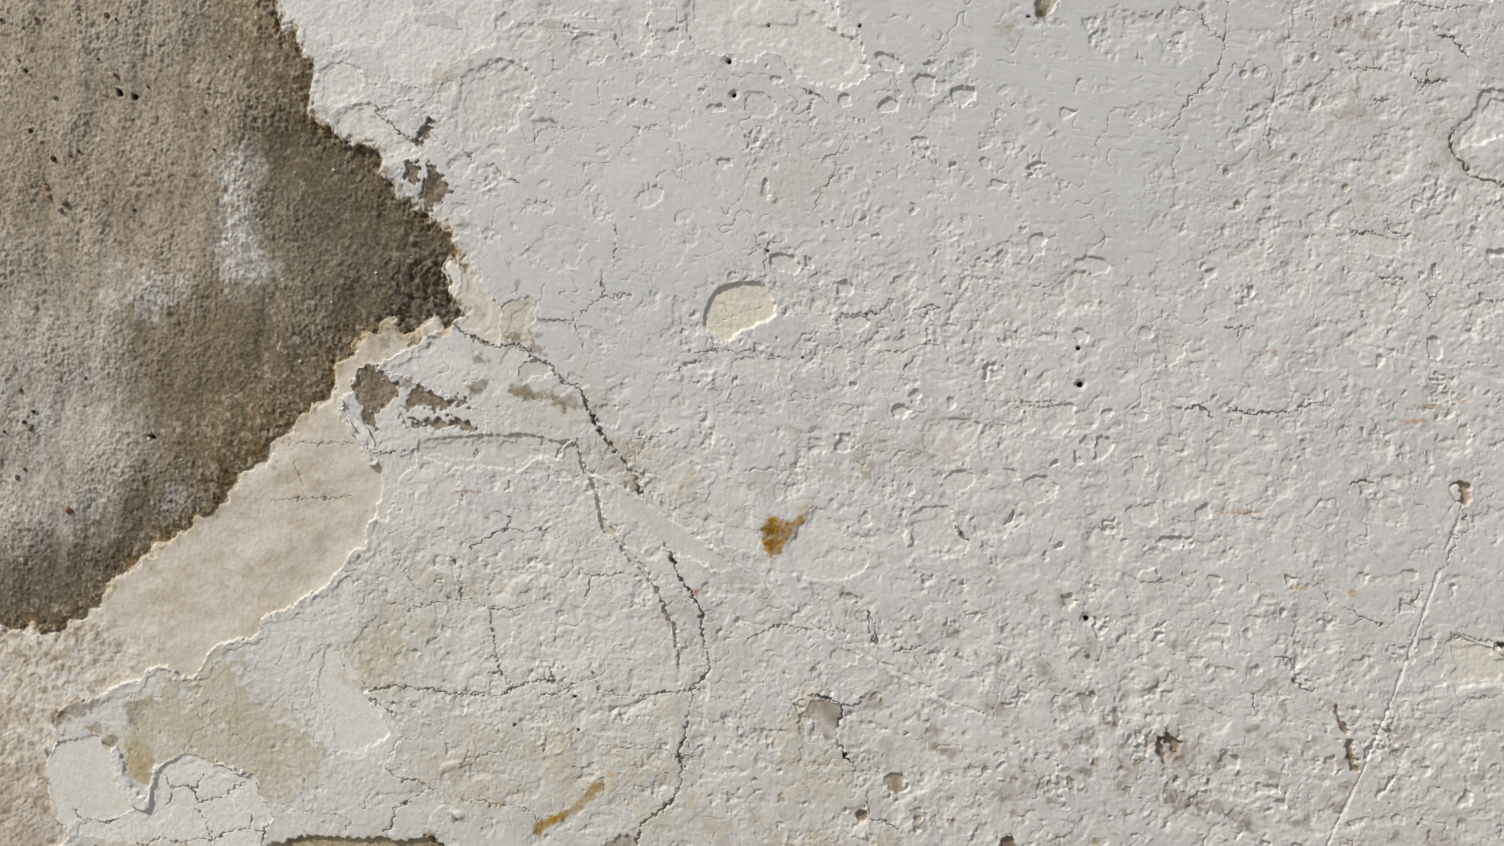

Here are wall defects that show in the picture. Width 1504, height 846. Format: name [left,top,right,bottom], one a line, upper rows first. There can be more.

damp [423,58,476,103]
peeling [661,0,977,109]
crack [1449,128,1504,189]
damp [0,100,470,628]
crack [451,225,681,498]
flaking render [0,0,589,846]
rust [760,497,818,559]
peeling [789,508,872,605]
peeling [901,470,976,559]
damp [336,607,432,704]
crack [256,511,753,846]
rust [533,782,597,841]